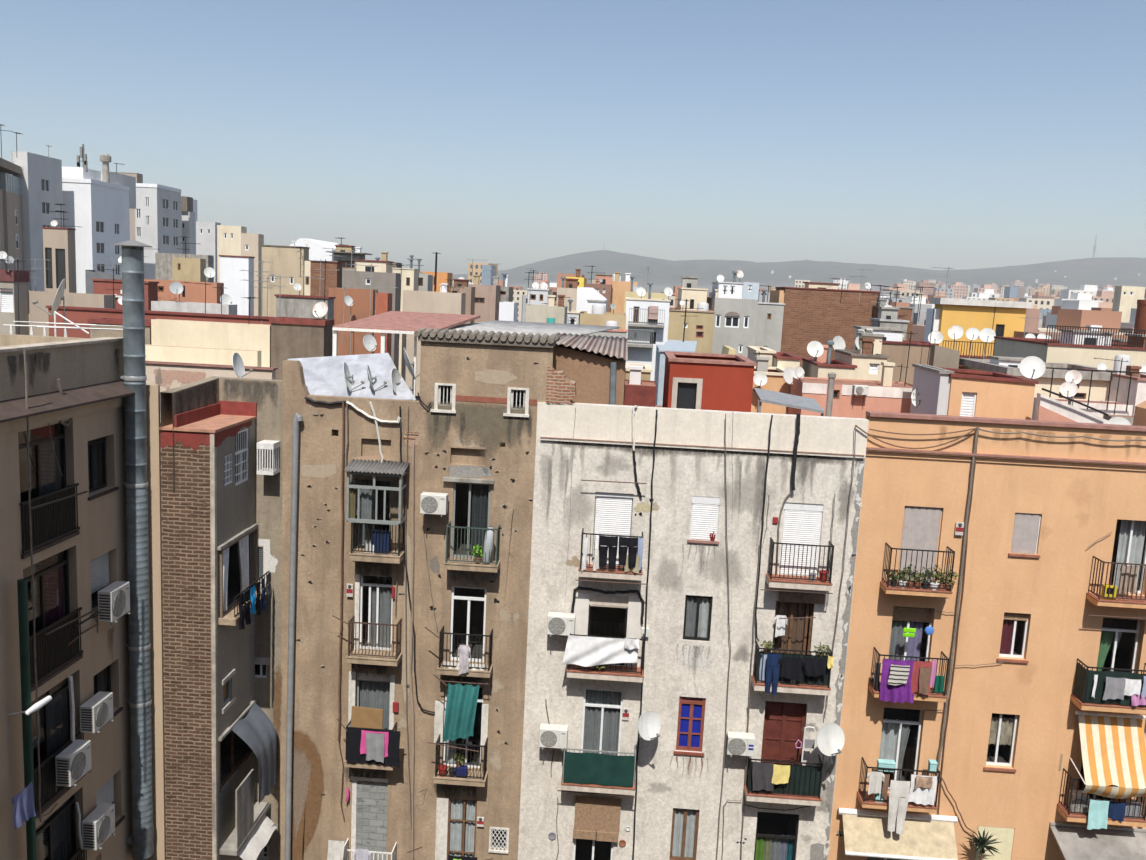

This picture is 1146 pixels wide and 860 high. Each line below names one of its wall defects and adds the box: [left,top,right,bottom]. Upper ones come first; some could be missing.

leakage [428,403,532,451]
leakage [840,488,852,516]
peeling [834,458,865,726]
peeling [810,754,844,860]